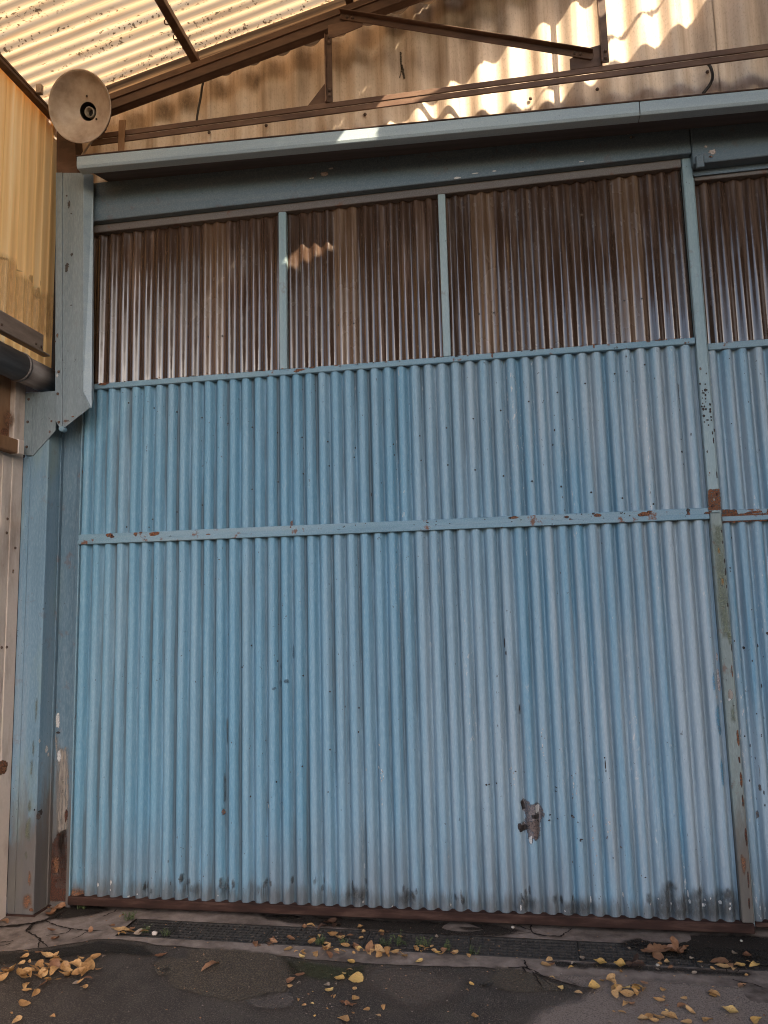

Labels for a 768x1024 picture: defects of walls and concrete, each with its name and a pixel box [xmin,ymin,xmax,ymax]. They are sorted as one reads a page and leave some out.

corrosion [704,489,768,523]
peeling [518,799,558,844]
corrosion [50,809,84,901]